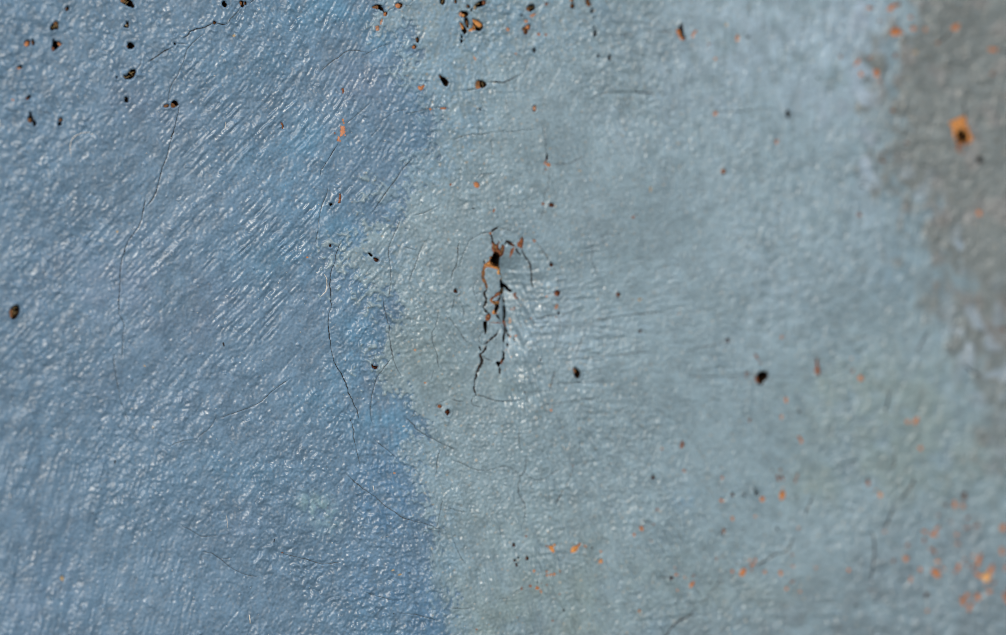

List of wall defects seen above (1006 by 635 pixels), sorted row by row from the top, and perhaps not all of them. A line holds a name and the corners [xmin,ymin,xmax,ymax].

crack [113,0,253,419]
crack [316,147,465,563]
crack [406,56,663,523]